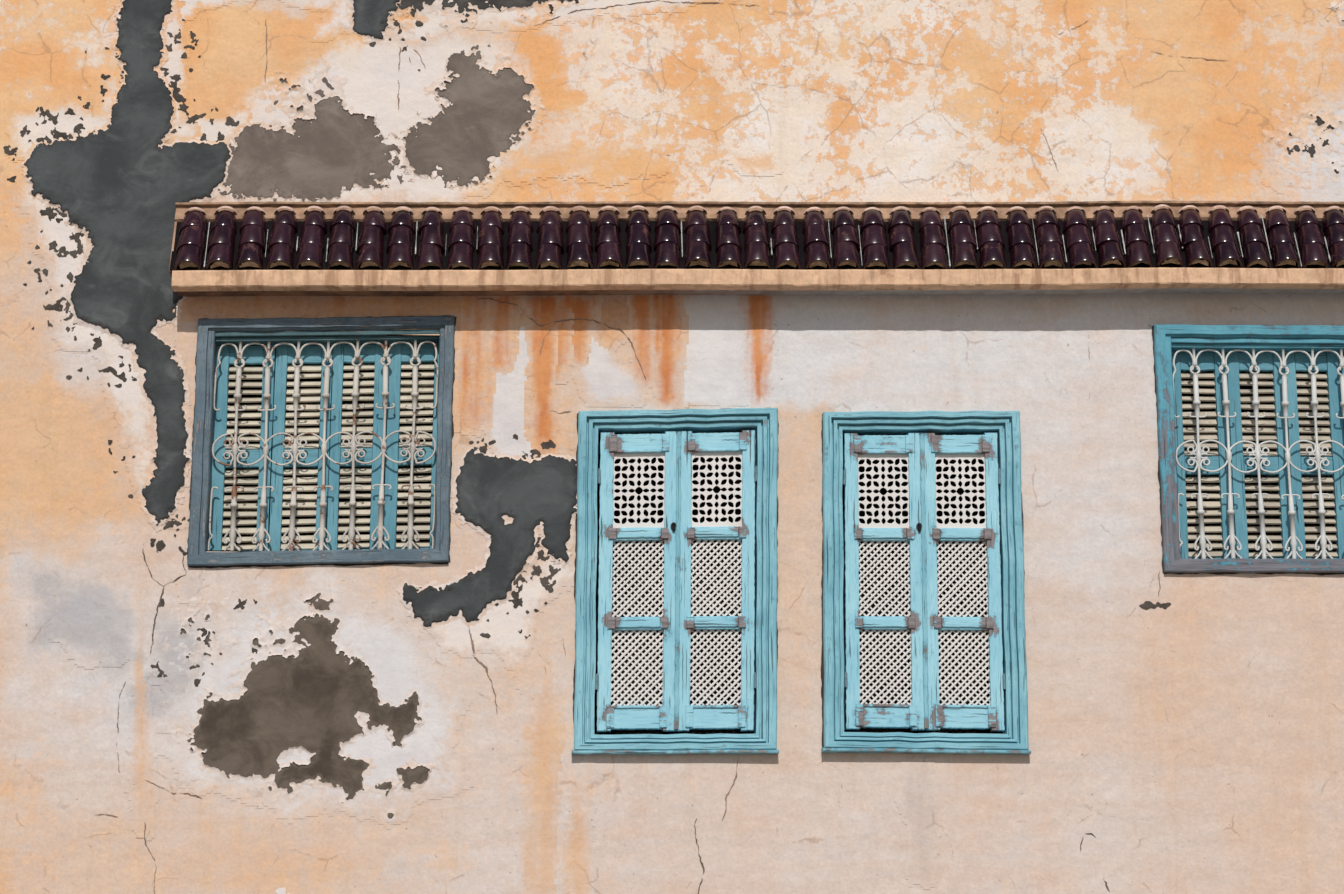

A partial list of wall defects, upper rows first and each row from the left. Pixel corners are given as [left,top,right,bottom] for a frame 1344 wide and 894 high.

spalling [1317,0,1344,26]
spalling [155,0,721,202]
spalling [1249,79,1344,202]
peeling [3,47,158,503]
corrosion [172,295,689,457]
peeling [469,327,556,463]
corrosion [734,295,779,408]
peeling [151,536,575,829]
crack [468,625,497,712]
crack [694,761,738,894]